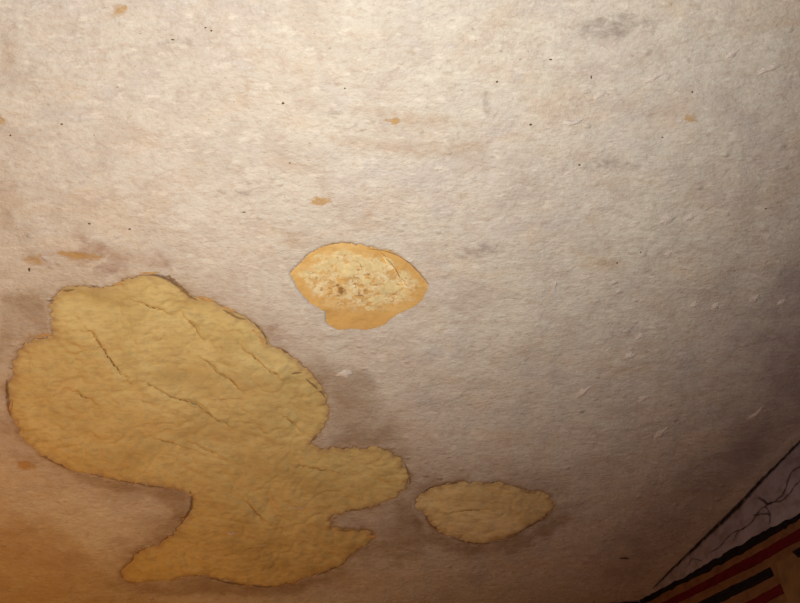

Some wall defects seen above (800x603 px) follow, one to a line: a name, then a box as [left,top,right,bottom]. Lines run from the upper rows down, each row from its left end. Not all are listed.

flaking render [290,242,427,330]
flaking render [6,272,410,586]
flaking render [415,481,554,544]